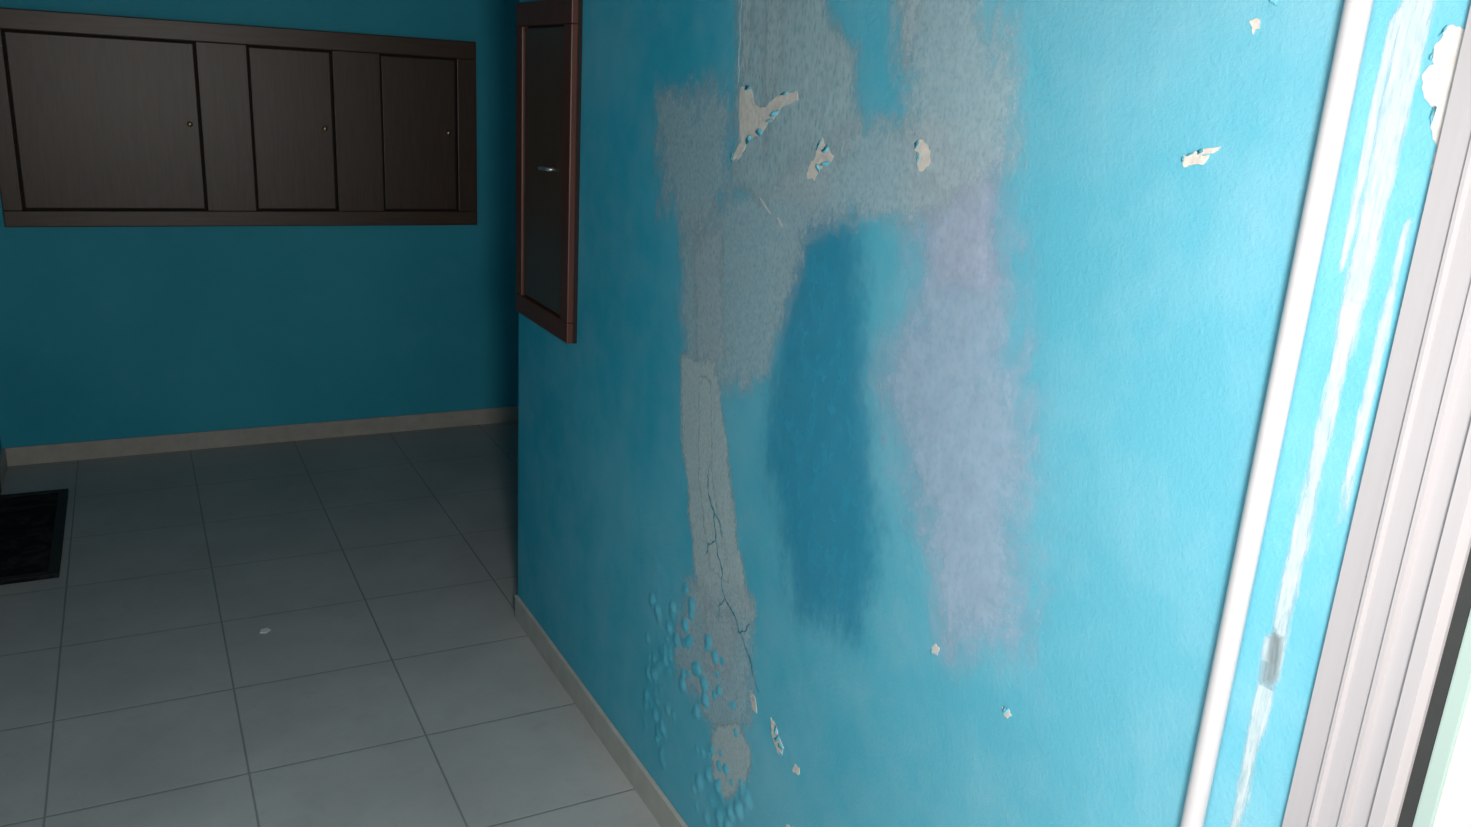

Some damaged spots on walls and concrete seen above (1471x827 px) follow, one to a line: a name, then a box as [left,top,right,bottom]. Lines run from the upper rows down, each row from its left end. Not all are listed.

peeling [1249,18,1261,34]
peeling [1421,24,1465,171]
peeling [731,85,798,163]
peeling [807,137,834,181]
peeling [914,139,930,172]
peeling [1181,146,1221,167]
peeling [749,690,800,775]